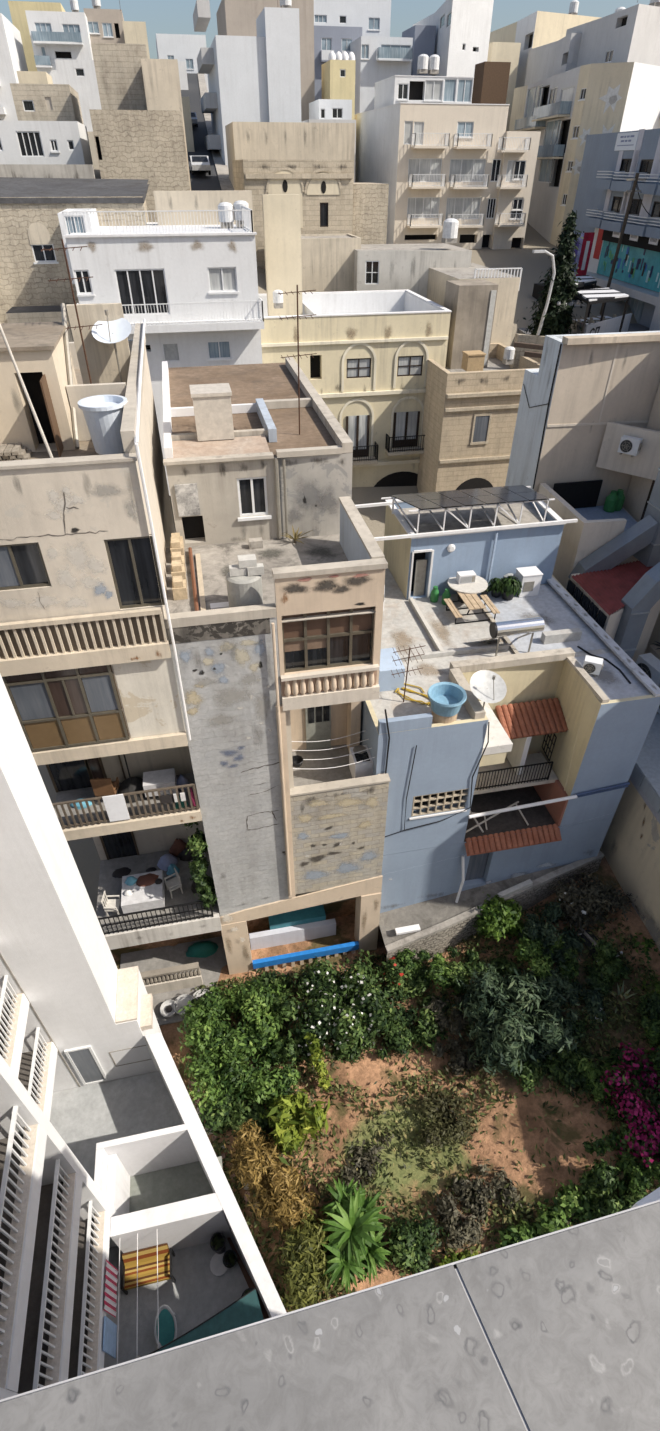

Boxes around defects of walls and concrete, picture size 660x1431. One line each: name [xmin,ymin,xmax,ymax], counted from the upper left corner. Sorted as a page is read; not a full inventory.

crack [0,491,104,540]
peeling [180,640,272,767]
peeling [298,798,377,880]